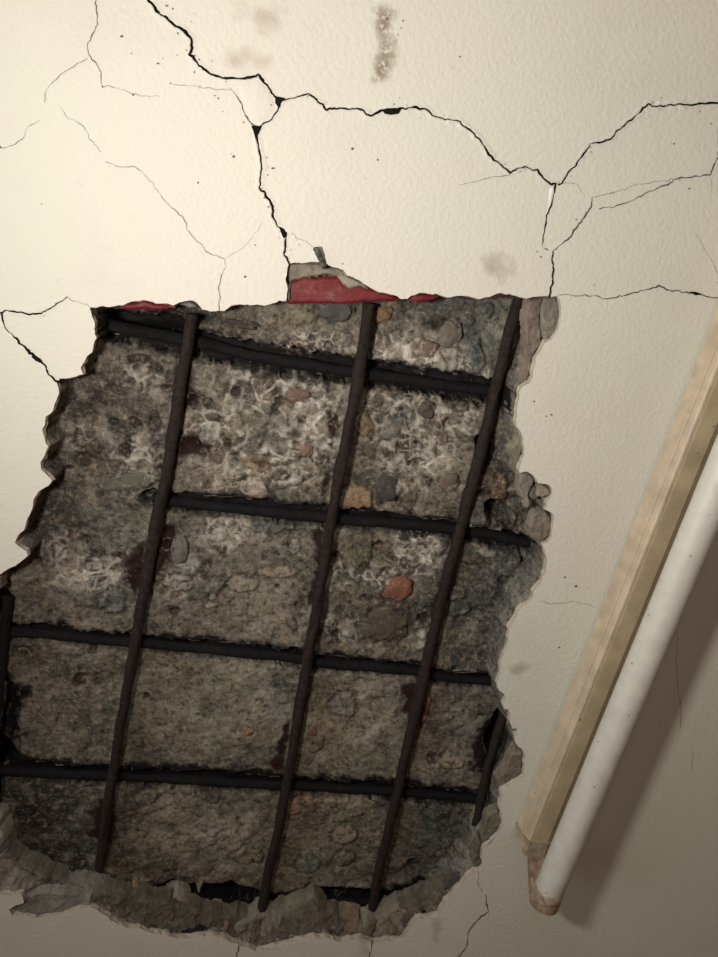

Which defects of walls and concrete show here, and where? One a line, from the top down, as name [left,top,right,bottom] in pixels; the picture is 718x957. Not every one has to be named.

crack [44,0,718,311]
crack [0,295,89,384]
spalling [0,262,561,952]
crack [458,873,489,957]